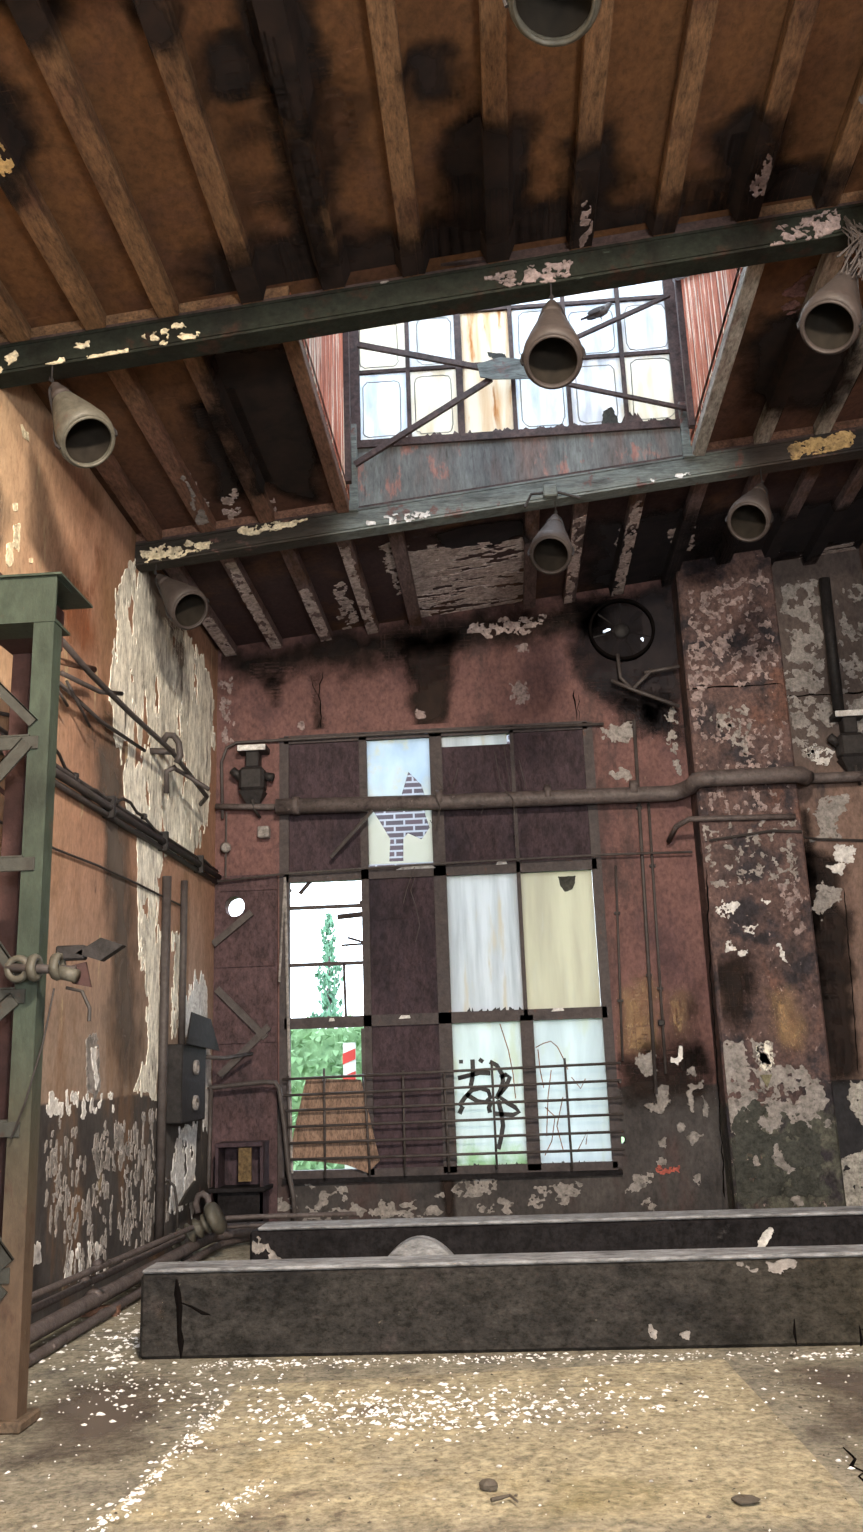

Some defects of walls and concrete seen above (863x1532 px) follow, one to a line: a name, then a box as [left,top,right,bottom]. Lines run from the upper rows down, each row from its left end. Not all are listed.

leakage [0,77,39,204]
leakage [190,0,851,304]
peeling [484,200,593,288]
peeling [787,430,856,460]
leakage [221,489,863,725]
leakage [608,695,685,742]
peeling [664,569,863,776]
peeling [33,473,308,1285]
peeling [702,785,856,963]
peeling [625,1046,709,1211]
peeling [723,1038,863,1208]
crack [843,1447,863,1481]